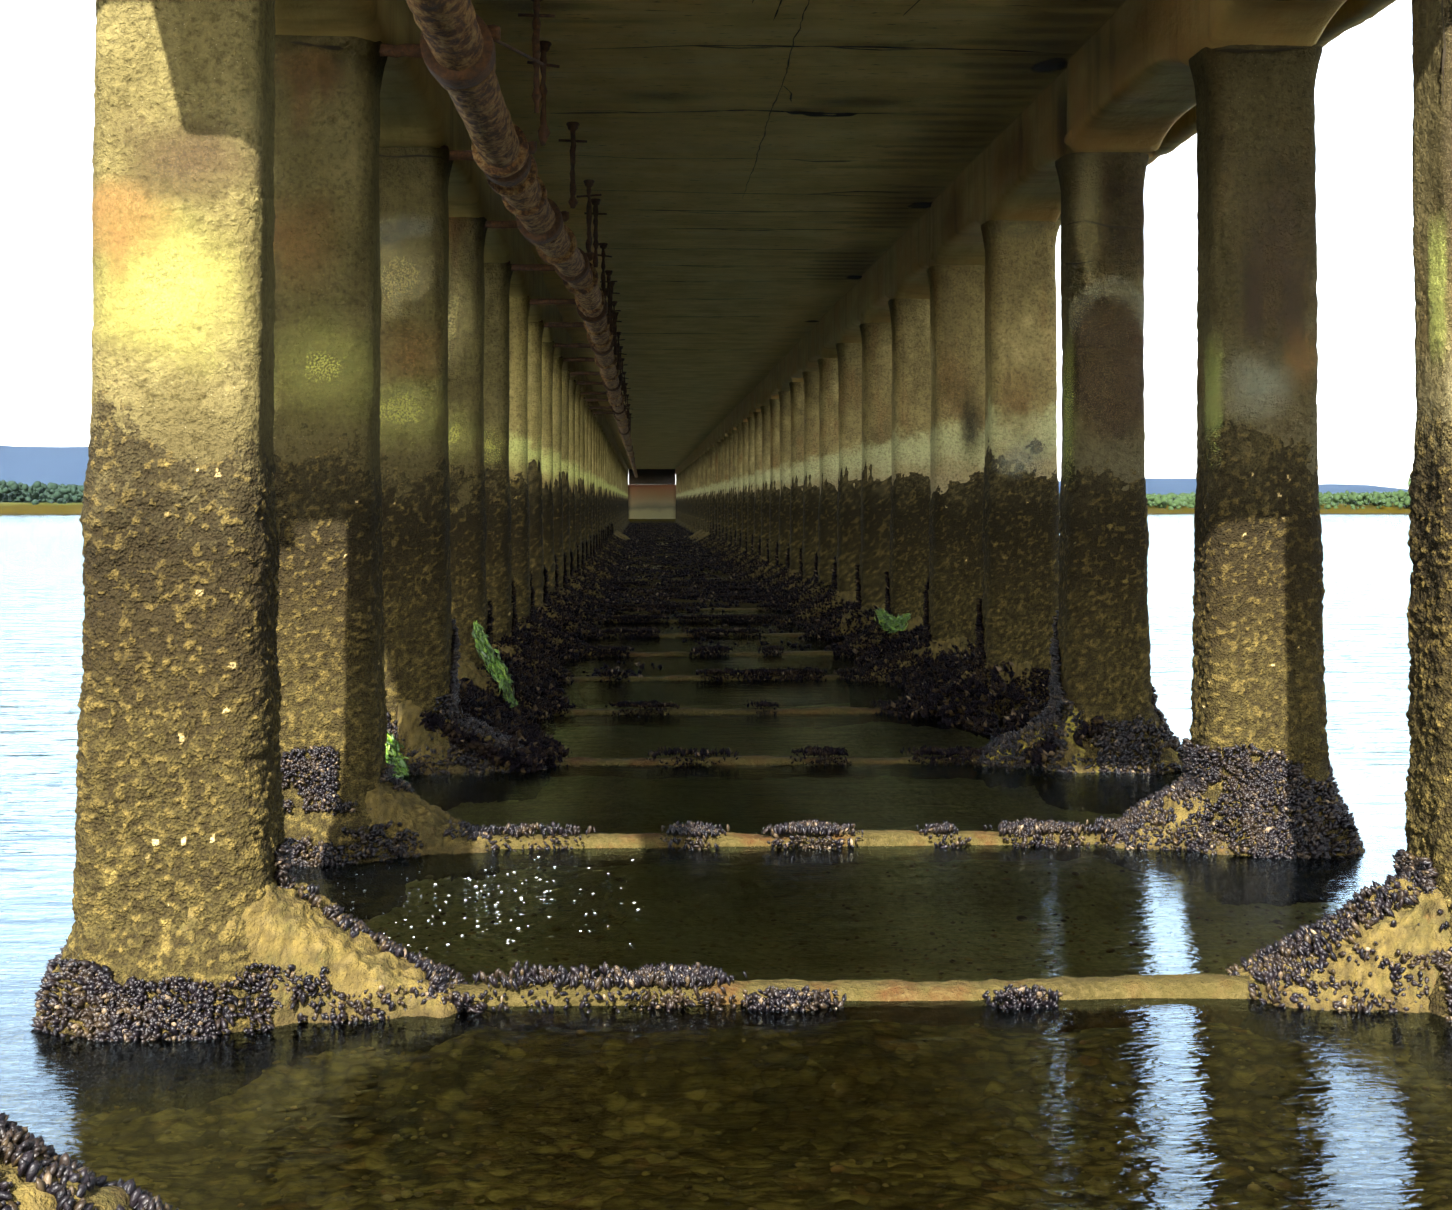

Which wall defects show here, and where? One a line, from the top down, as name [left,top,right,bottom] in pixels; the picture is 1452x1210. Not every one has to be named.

crack [556,0,1058,350]